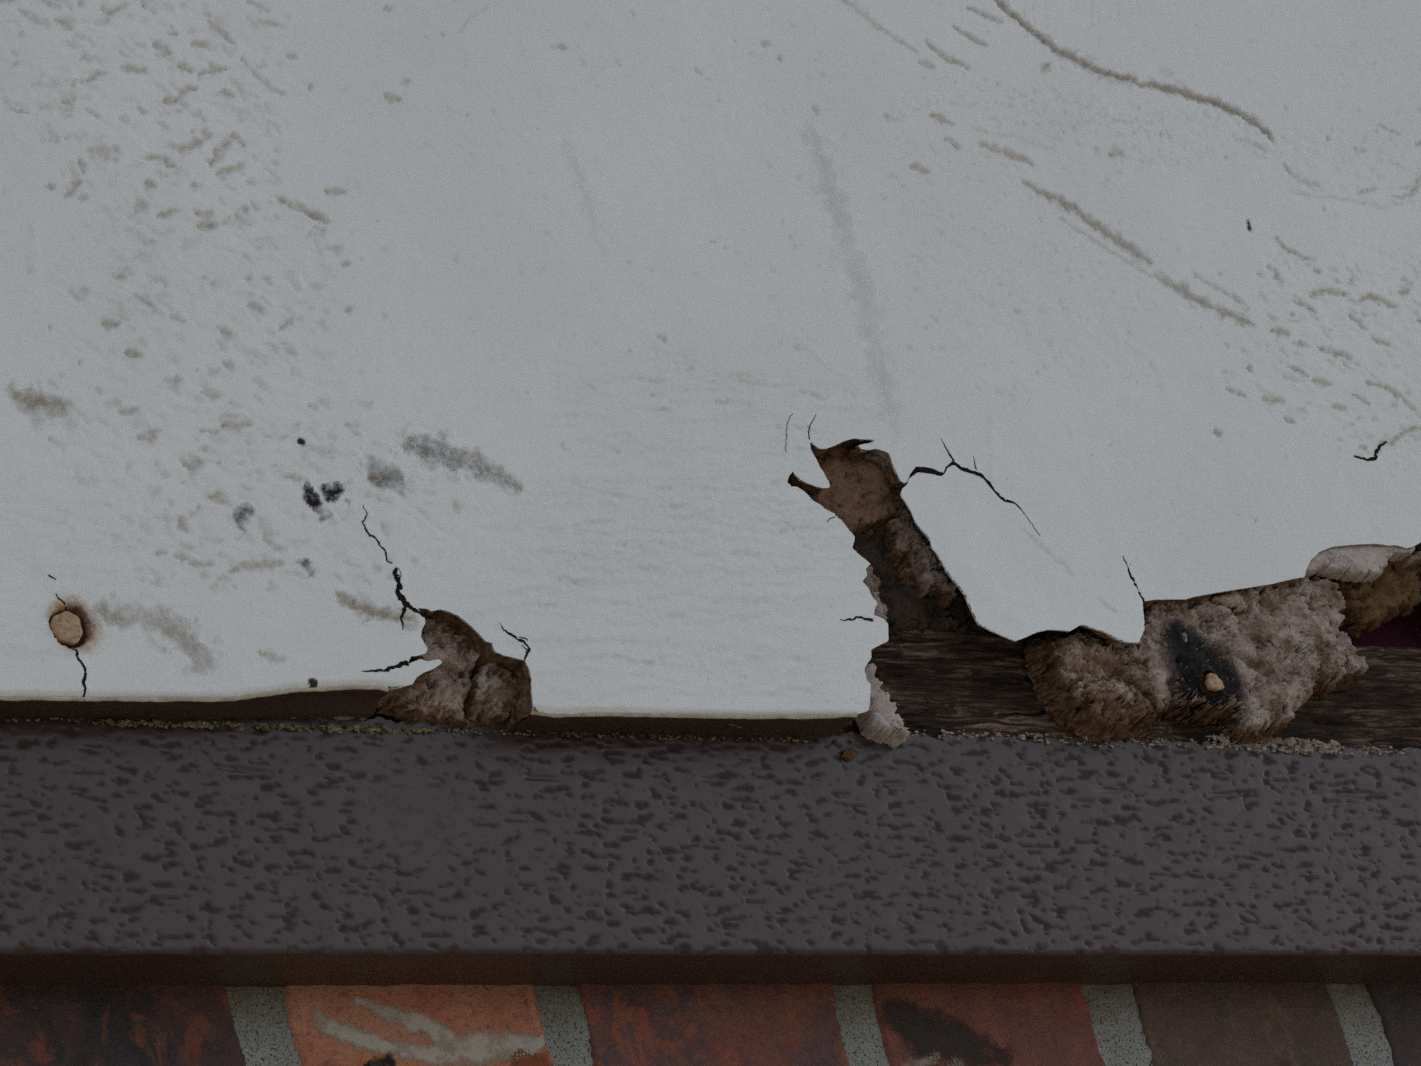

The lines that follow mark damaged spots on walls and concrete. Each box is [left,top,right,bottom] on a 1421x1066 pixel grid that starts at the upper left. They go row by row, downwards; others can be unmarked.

crack [910,438,1040,535]
corrosion [50,601,96,649]
crack [362,504,425,672]
spalling [376,608,538,730]
spalling [787,438,1421,756]